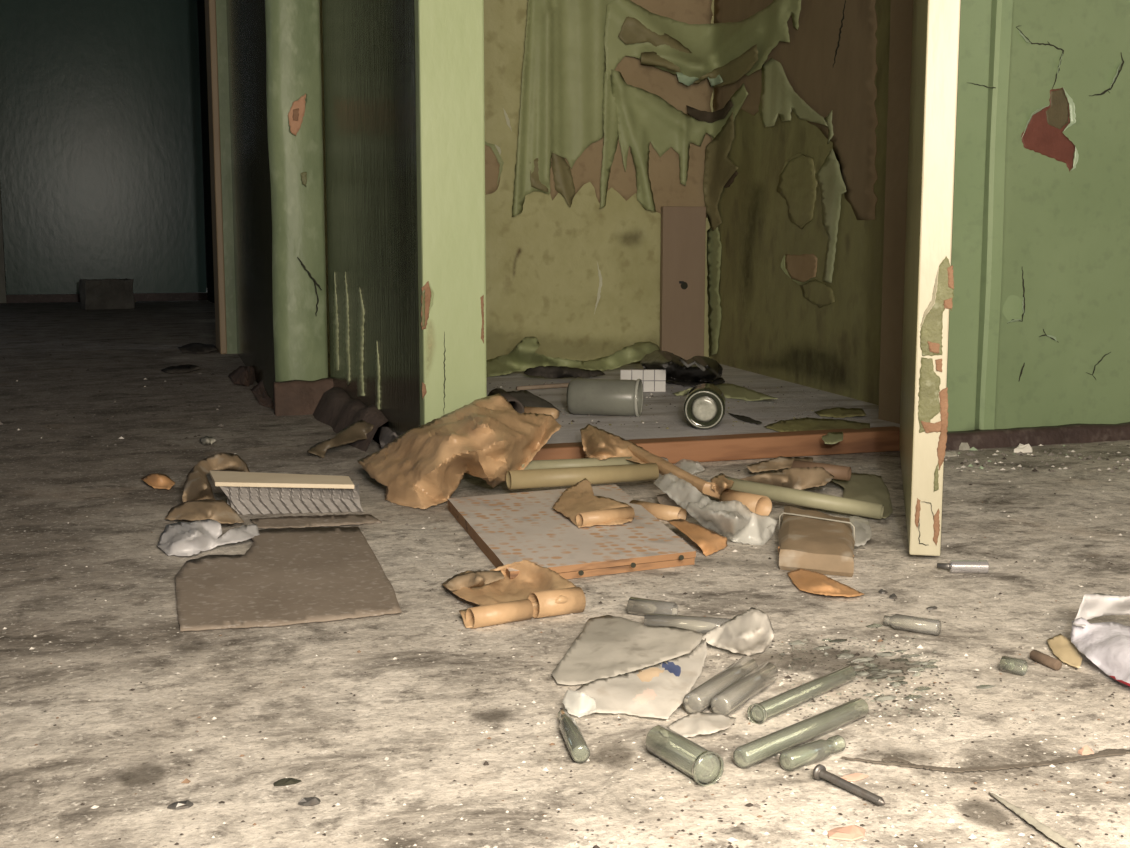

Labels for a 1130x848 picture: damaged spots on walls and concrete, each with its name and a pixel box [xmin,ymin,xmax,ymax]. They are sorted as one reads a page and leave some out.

crack [833,0,846,65]
crack [1016,26,1064,89]
crack [1089,53,1124,96]
spalling [288,93,308,136]
peeling [1021,87,1079,172]
peeling [485,0,878,356]
crack [297,257,322,316]
peeling [918,256,970,492]
peeling [764,407,871,432]
peeling [915,498,940,545]